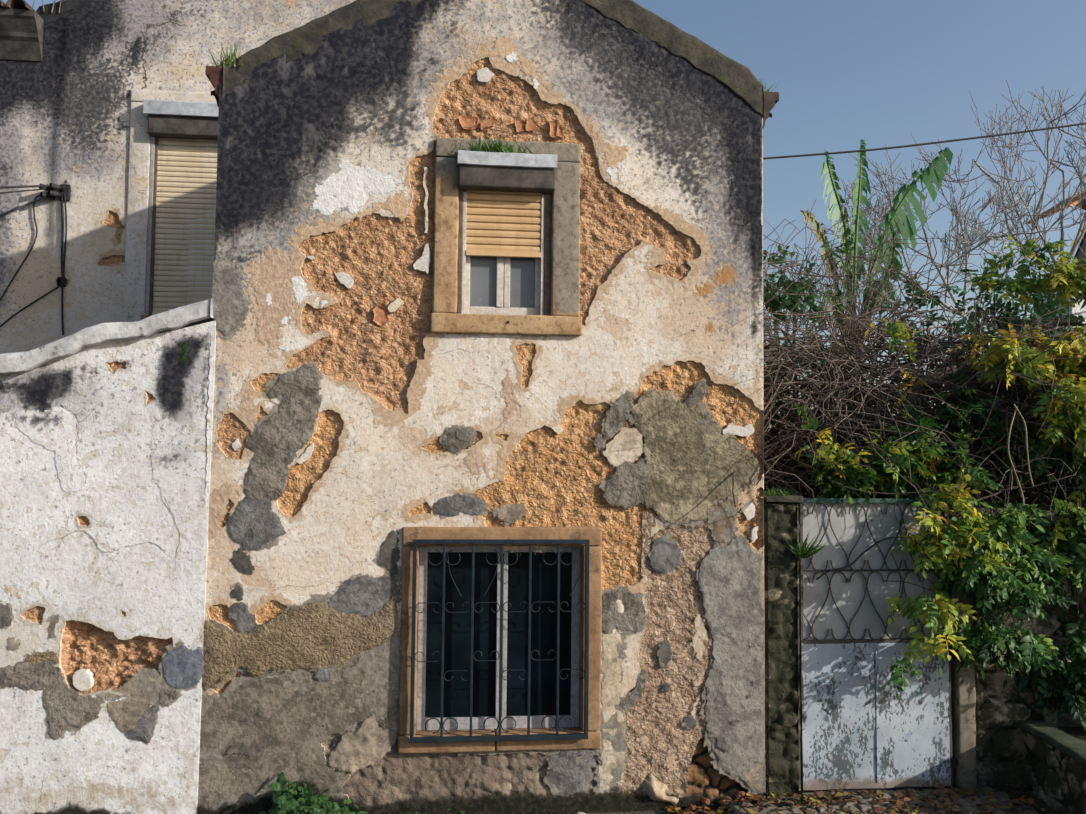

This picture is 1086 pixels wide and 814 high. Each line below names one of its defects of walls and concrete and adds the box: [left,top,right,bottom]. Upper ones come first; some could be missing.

damp [0,0,217,161]
damp [214,0,463,268]
damp [529,0,763,299]
spalling [215,37,714,460]
damp [0,365,97,431]
crack [42,405,180,566]
damp [157,335,211,417]
spalling [271,409,350,524]
spalling [5,585,46,626]
spalling [56,618,173,698]
spalling [418,335,764,800]
spalling [321,716,569,807]